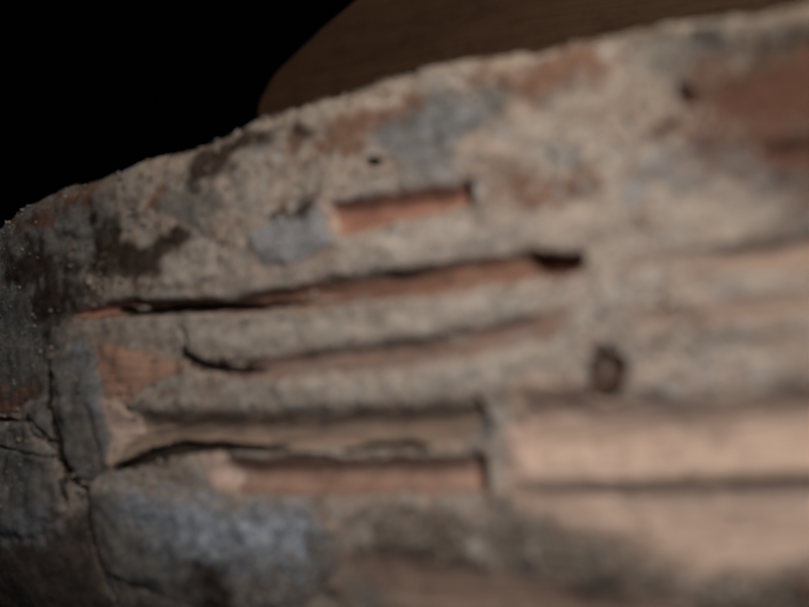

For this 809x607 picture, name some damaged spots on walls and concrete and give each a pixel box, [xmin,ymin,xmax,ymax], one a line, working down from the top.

spalling [69,243,587,325]
spalling [313,183,474,243]
crack [0,361,191,607]
crack [108,438,291,471]
spalling [96,309,564,509]
spalling [506,372,809,581]